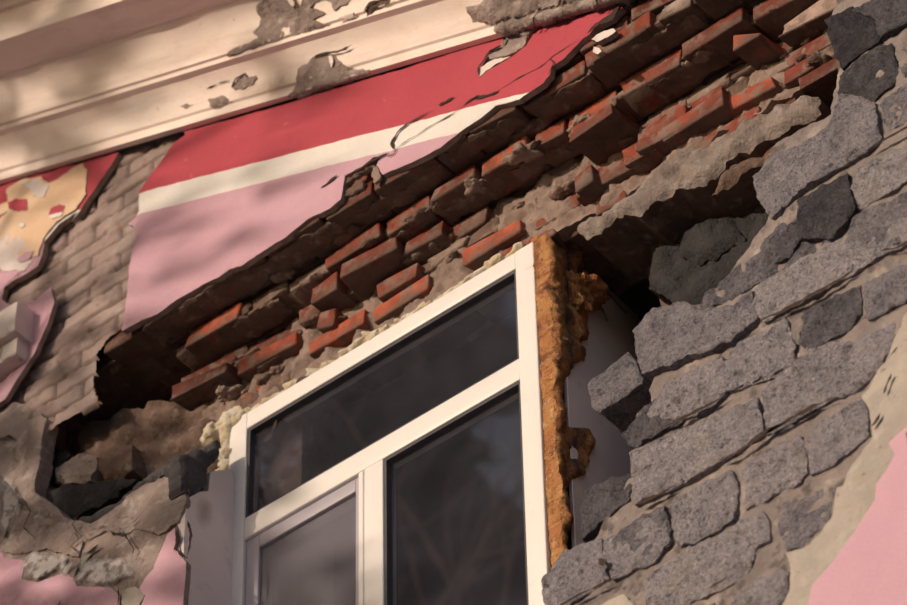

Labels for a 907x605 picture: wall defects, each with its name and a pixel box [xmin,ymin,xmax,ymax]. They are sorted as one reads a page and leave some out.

spalling [226,0,391,57]
spalling [466,0,636,77]
spalling [207,73,257,109]
spalling [288,45,370,100]
crack [387,4,619,157]
spalling [344,153,388,199]
spalling [0,128,221,605]
spalling [233,365,292,409]
spalling [783,313,907,605]